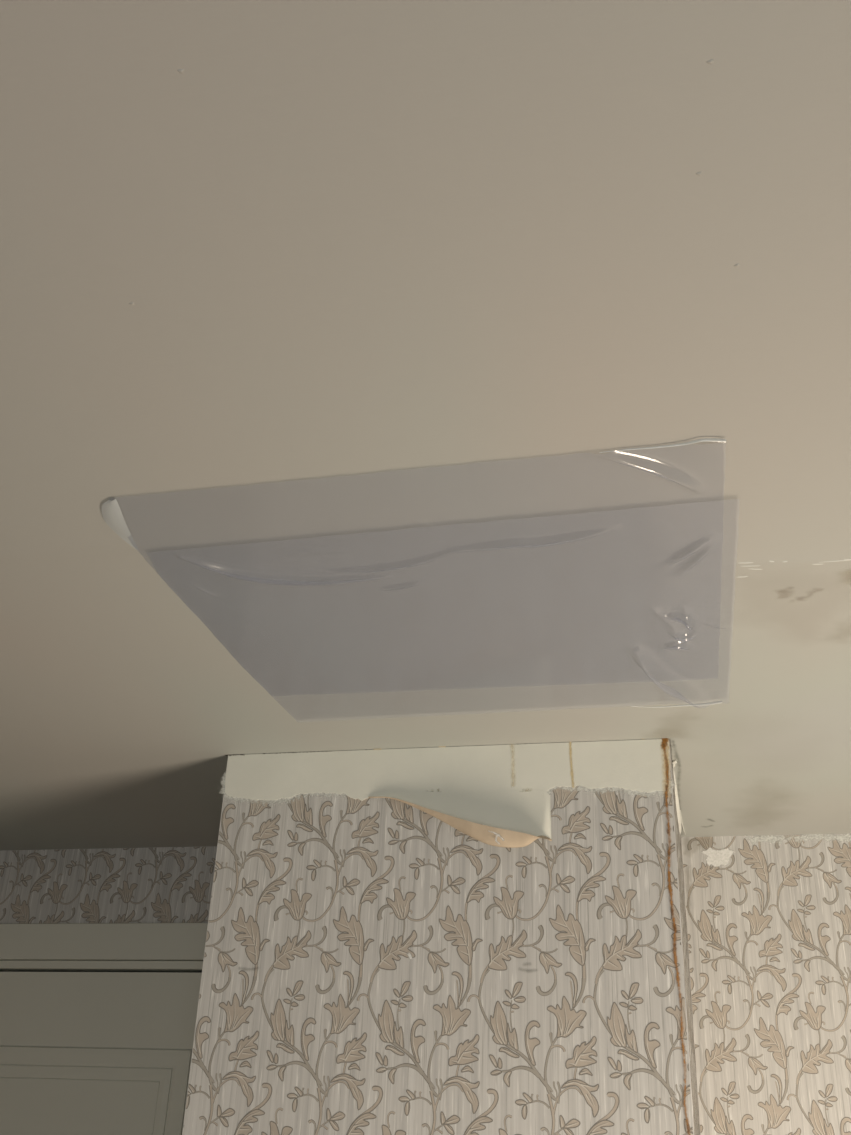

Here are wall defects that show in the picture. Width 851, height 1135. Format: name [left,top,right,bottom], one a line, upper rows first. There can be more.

corrosion [661,738,689,1134]